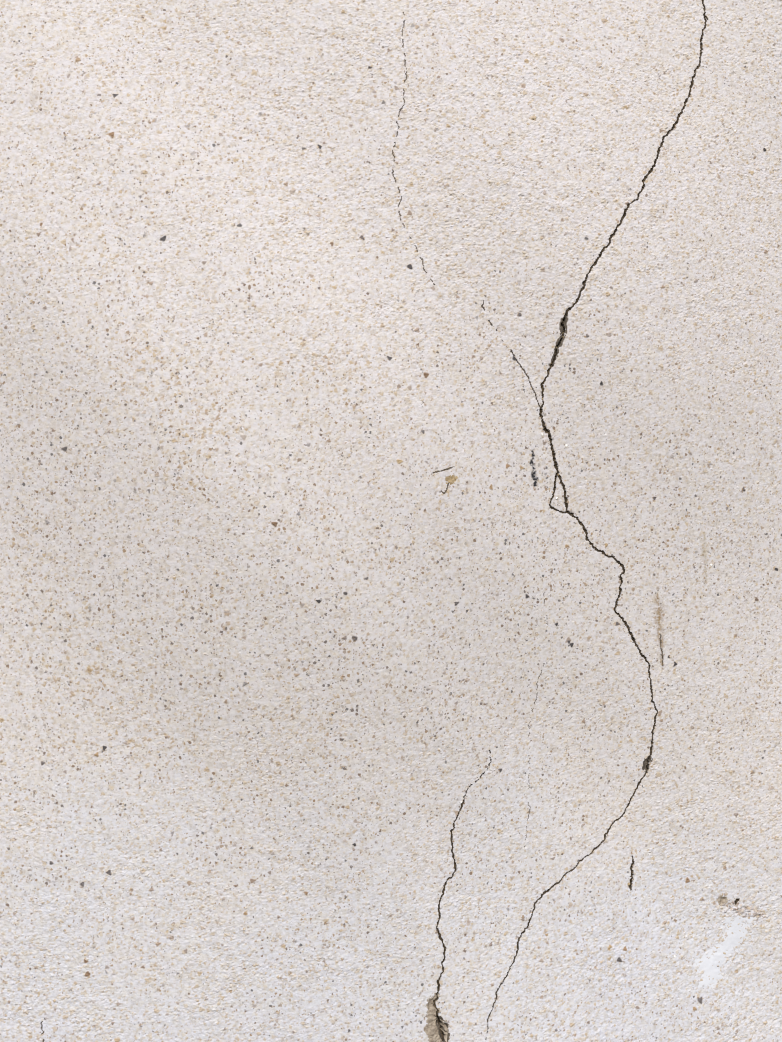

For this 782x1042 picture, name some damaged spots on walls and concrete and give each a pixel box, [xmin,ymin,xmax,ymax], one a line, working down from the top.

crack [433,750,491,1041]
crack [485,0,708,1040]